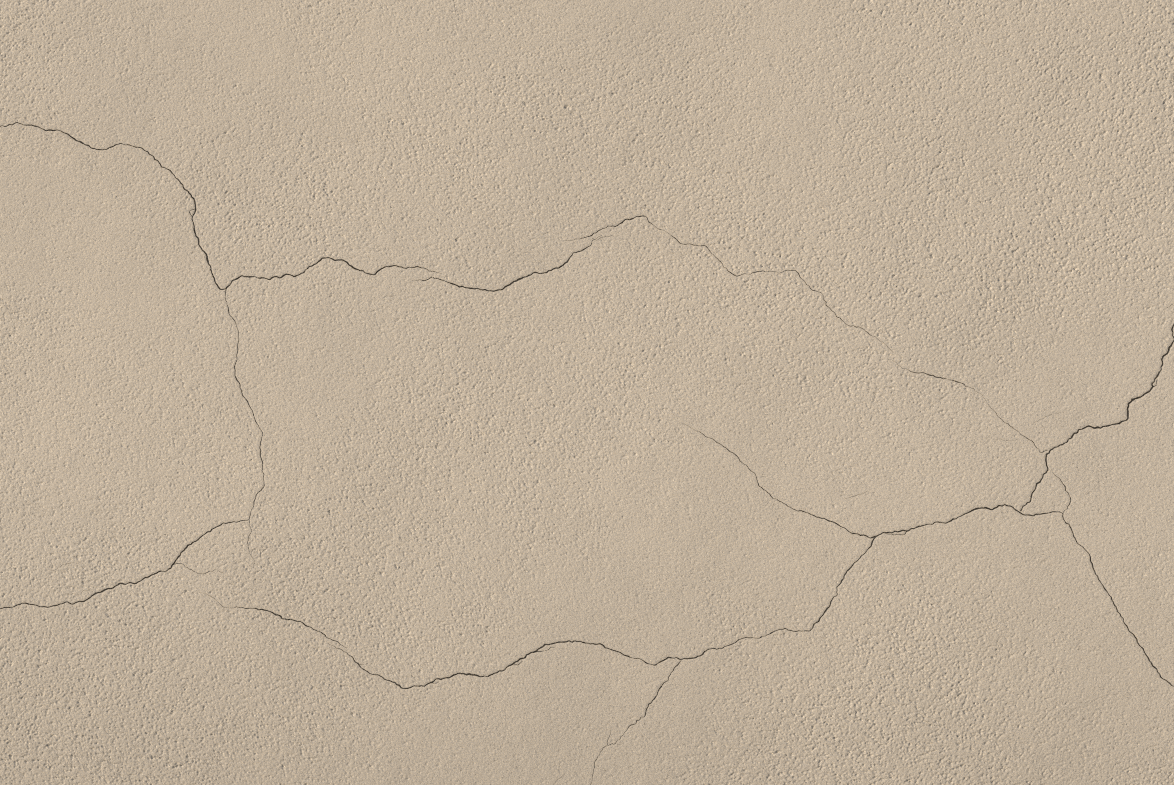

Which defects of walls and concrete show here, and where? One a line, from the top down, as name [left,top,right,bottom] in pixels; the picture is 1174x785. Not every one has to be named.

crack [0,122,968,609]
crack [199,324,1174,785]